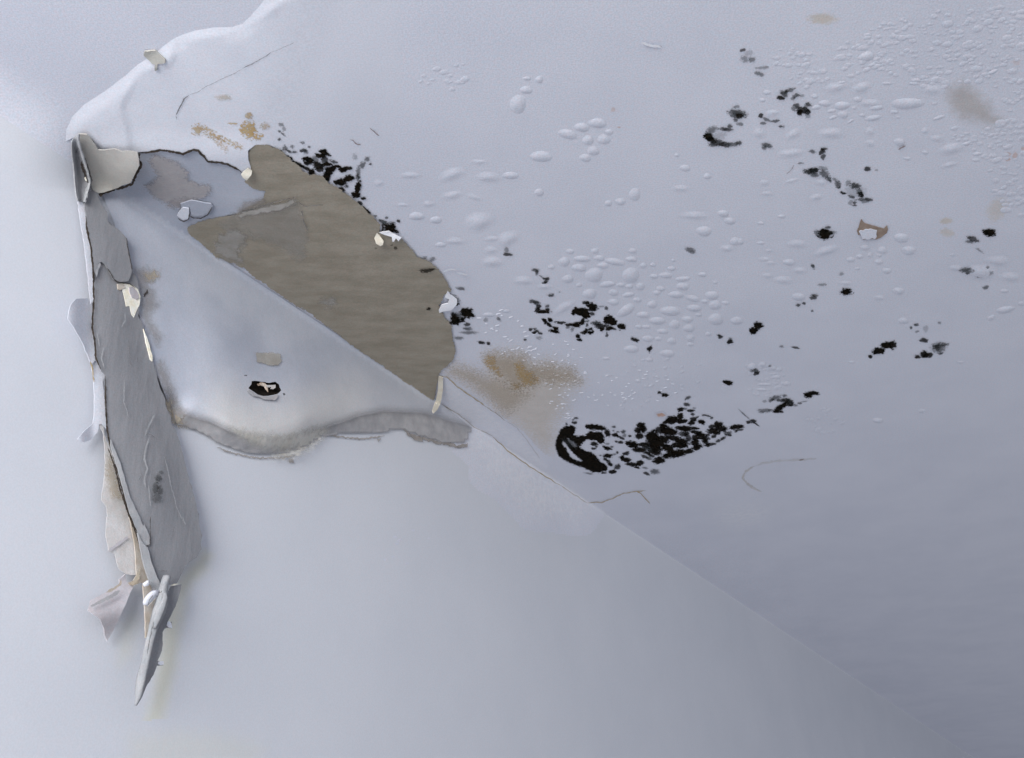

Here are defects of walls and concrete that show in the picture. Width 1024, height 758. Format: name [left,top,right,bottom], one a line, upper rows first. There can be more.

water stain [777,88,811,116]
rust [192,123,225,142]
rust [228,112,264,139]
water stain [702,110,784,148]
water stain [278,130,400,233]
water stain [805,148,873,206]
peeling [857,219,888,240]
water stain [524,300,652,354]
flaking render [66,0,471,706]
water stain [868,340,897,359]
water stain [768,391,820,413]
water stain [555,396,759,475]